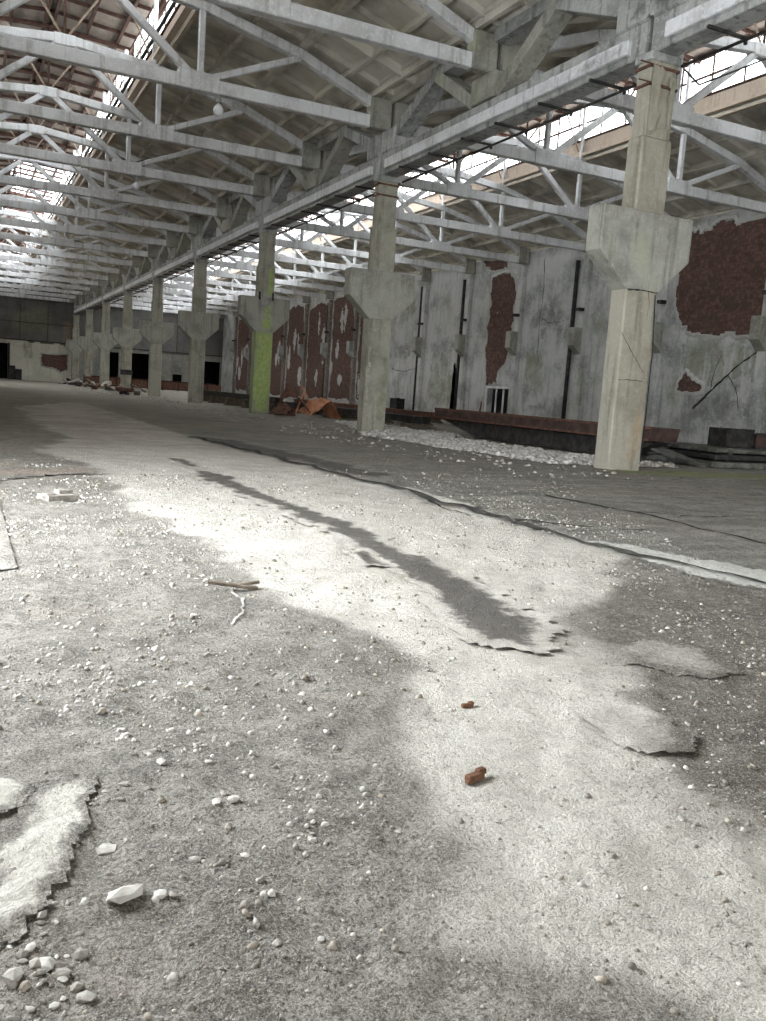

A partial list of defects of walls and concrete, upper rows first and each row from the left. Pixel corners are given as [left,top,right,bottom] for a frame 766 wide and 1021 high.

spalling [39,352,69,373]
spalling [270,295,371,421]
spalling [481,259,518,386]
spalling [674,368,705,396]
spalling [673,214,766,341]
leakage [159,457,568,654]